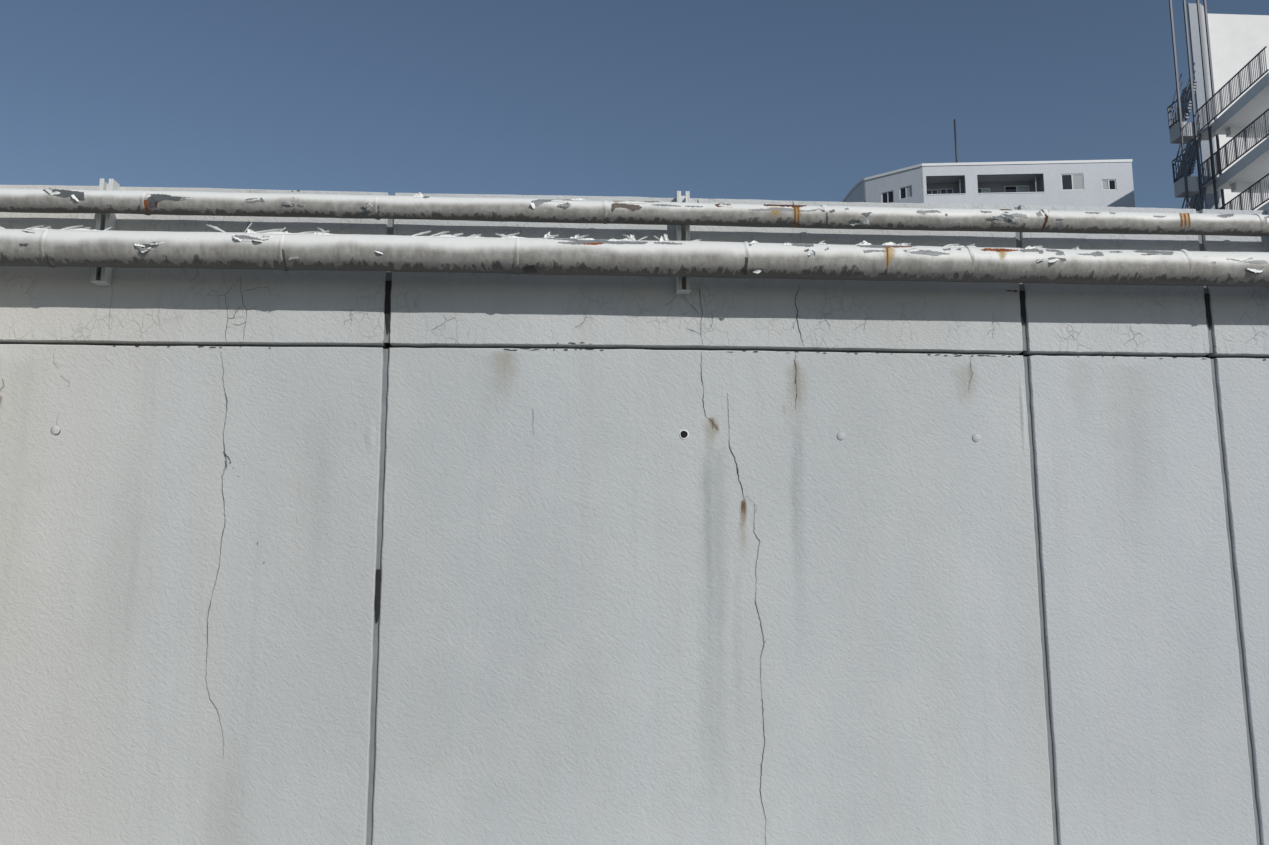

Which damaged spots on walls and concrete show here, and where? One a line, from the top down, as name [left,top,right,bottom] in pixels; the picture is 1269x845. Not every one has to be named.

crack [205,277,271,755]
crack [664,290,766,841]